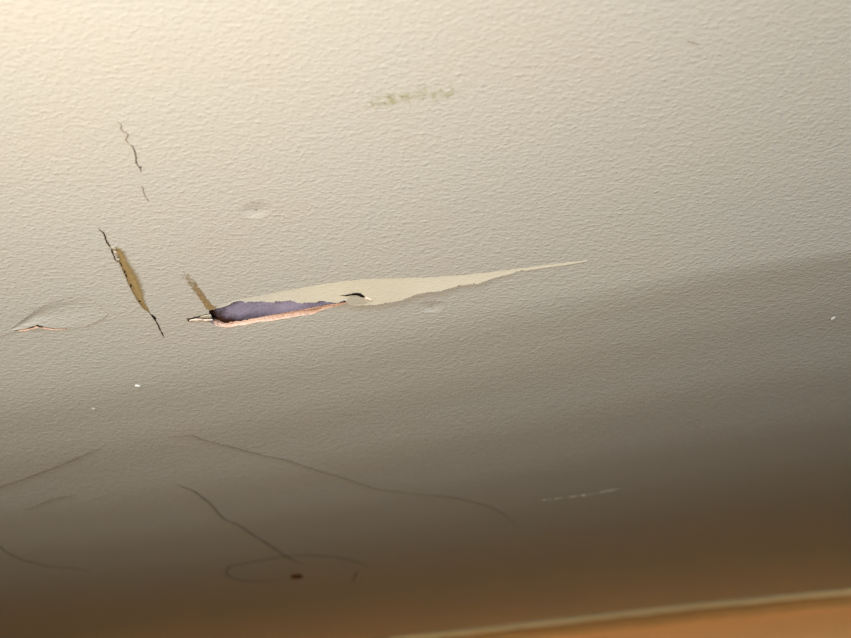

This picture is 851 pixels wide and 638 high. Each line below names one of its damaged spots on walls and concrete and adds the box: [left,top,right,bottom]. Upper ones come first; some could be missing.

crack [98,227,164,337]
peeling [213,260,587,320]